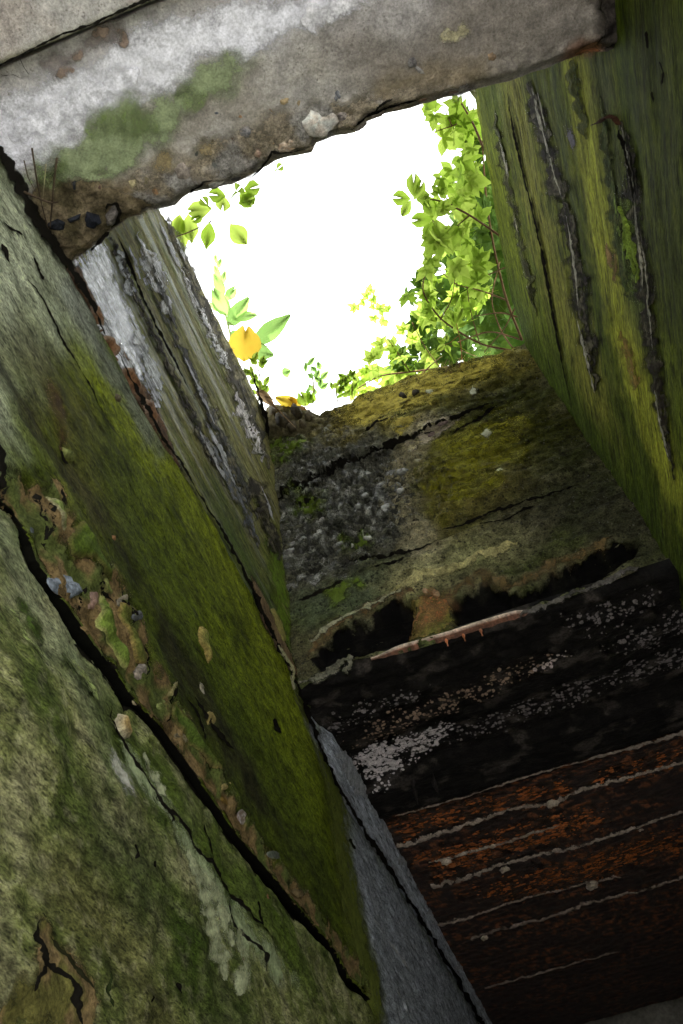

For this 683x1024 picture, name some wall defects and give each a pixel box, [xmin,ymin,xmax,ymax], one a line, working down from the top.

crack [617,130,636,201]
crack [507,93,572,404]
crack [0,146,497,1024]
crack [299,484,579,601]
spalling [307,536,638,672]
spalling [0,472,370,996]
peeling [322,585,683,925]
rust [387,775,611,880]
rust [459,828,683,903]